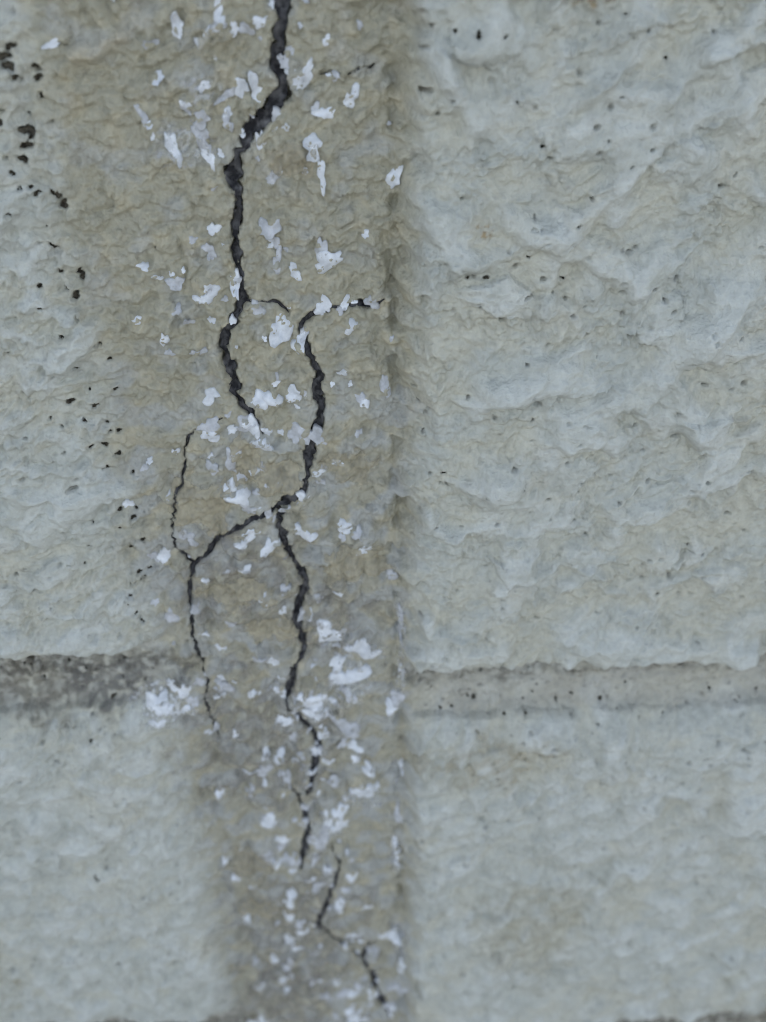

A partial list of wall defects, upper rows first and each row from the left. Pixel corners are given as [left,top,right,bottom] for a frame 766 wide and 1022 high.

crack [170,0,392,1019]